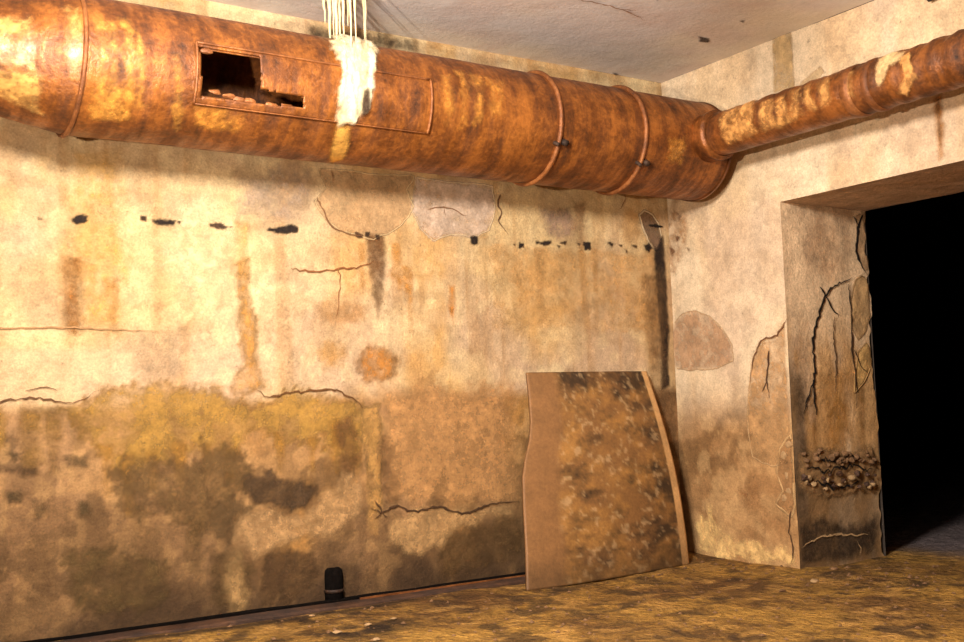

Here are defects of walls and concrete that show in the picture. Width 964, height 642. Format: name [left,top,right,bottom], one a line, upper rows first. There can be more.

rust [208,89,278,106]
rust [330,128,347,162]
rust [934,96,943,154]
peeling [673,311,734,371]
crack [750,319,787,392]
crack [804,215,868,415]
crack [0,387,99,403]
leakage [67,258,515,549]
crack [257,388,361,405]
spalling [747,323,877,517]
leakage [440,511,523,574]
leakage [212,551,315,603]